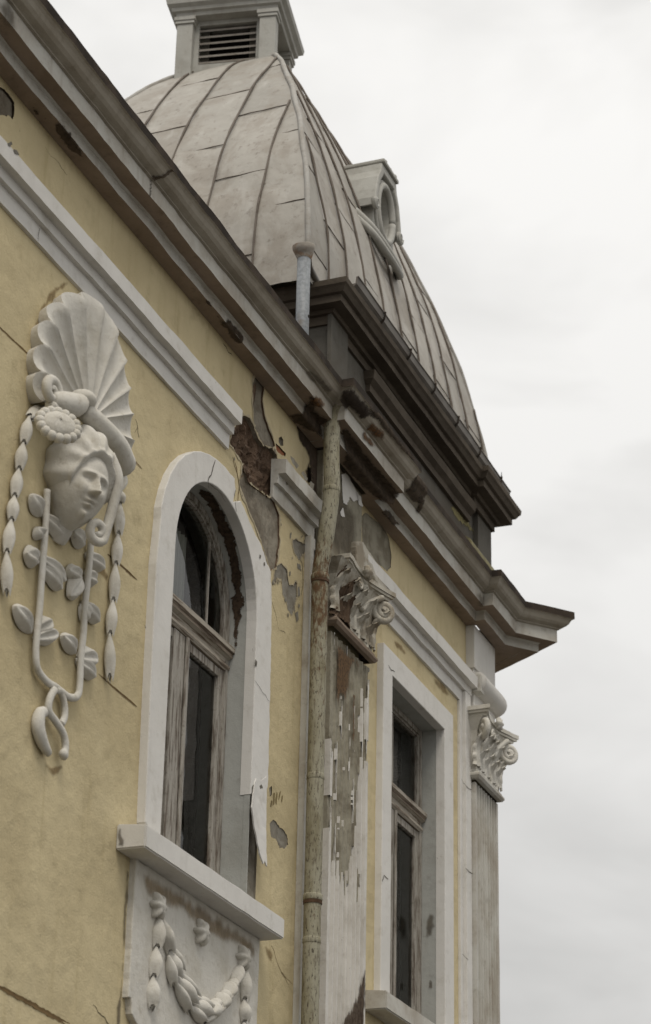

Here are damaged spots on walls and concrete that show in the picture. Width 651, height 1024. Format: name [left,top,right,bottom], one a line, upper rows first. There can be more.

peeling [199,490,245,646]
crack [208,460,244,511]
spalling [229,376,314,622]
spalling [340,473,391,571]
rust [336,643,357,741]
peeling [323,631,368,902]
peeling [242,776,288,899]
crack [0,986,70,1024]
spalling [344,973,366,1024]